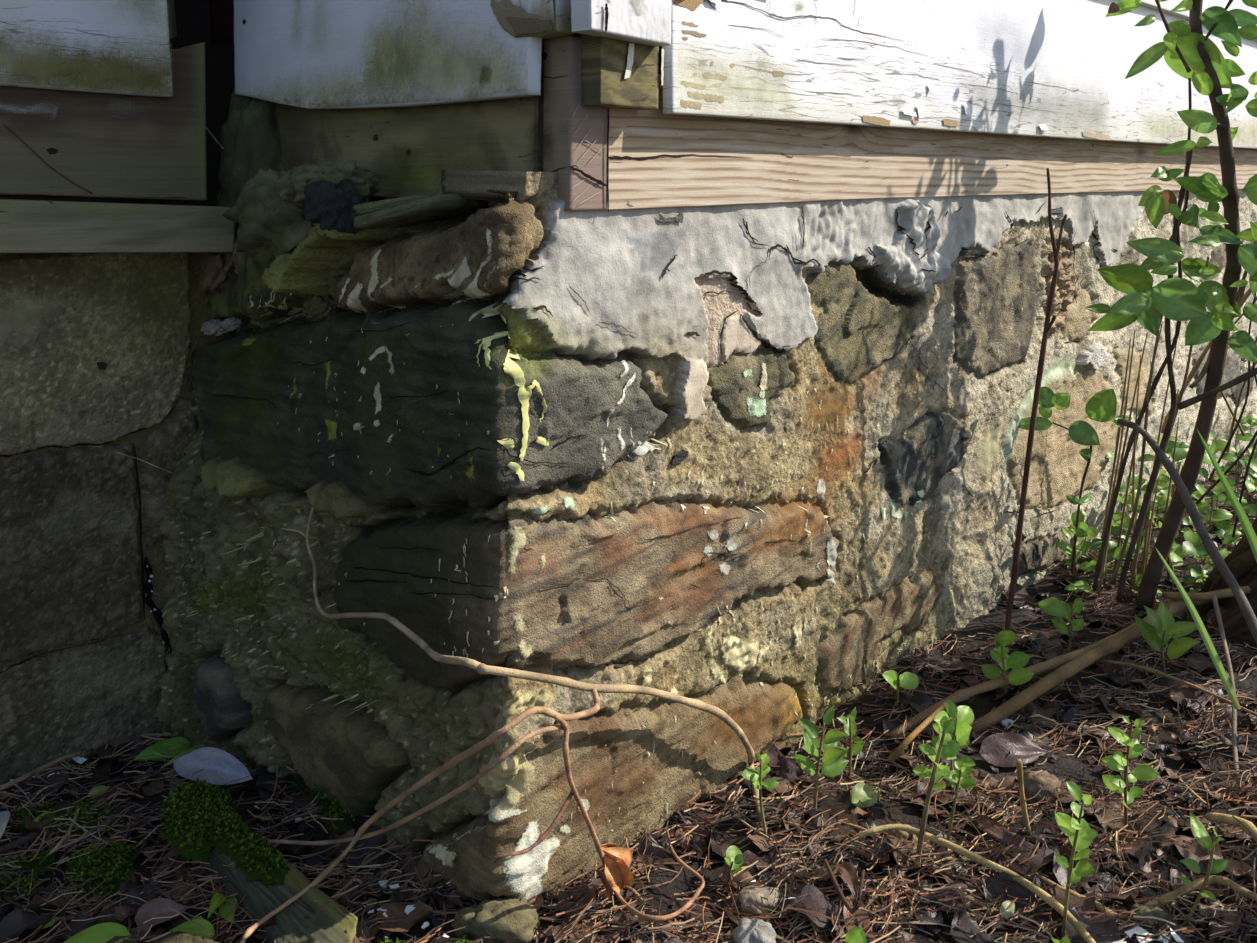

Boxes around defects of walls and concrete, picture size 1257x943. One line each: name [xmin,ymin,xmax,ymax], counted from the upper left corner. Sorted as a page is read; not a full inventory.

peeling [673,0,722,40]
damp [296,26,512,107]
peeling [681,61,735,110]
crack [722,0,1083,122]
spalling [658,210,684,223]
spalling [849,263,921,308]
spalling [694,274,773,367]
damp [325,419,337,441]
crack [407,434,589,476]
crack [0,406,176,673]